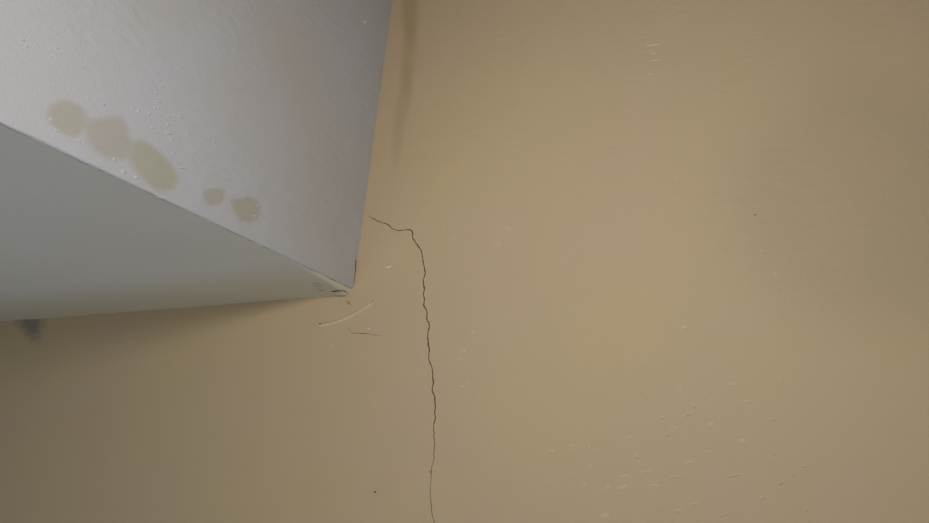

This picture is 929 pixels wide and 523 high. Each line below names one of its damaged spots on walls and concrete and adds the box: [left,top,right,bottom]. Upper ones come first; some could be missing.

leakage [42,96,185,199]
leakage [200,186,265,226]
crack [368,215,437,523]